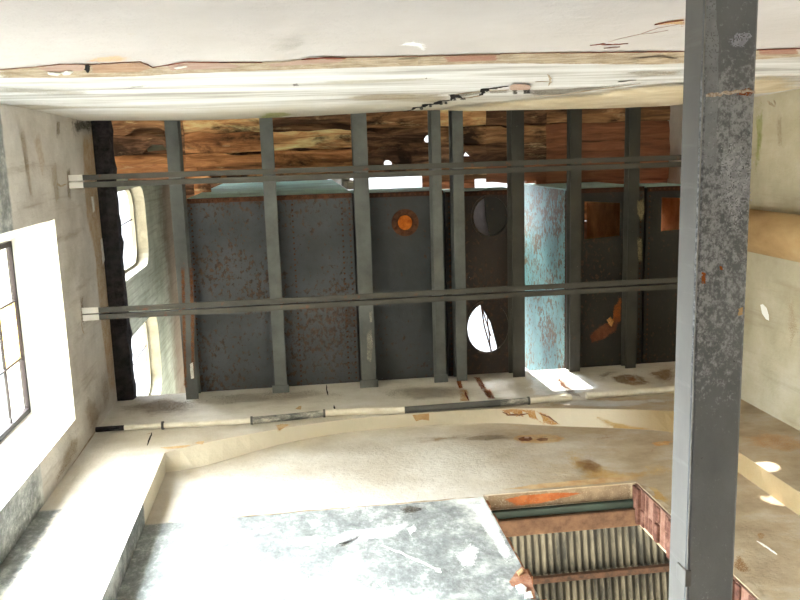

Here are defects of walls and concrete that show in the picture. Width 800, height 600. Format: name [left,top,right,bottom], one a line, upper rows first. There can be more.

crack [0,23,684,96]
crack [756,48,800,60]
crack [404,86,508,112]
rust [181,263,195,388]
rust [590,298,622,343]